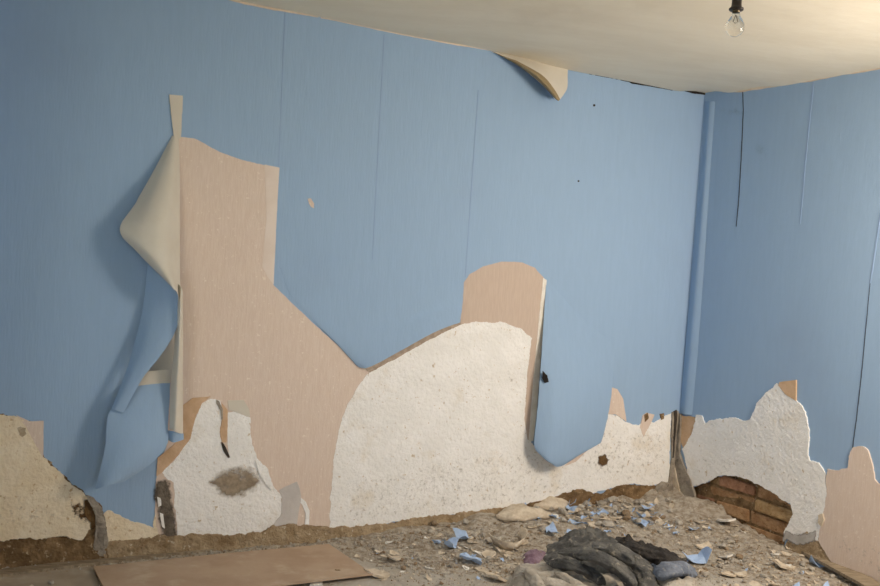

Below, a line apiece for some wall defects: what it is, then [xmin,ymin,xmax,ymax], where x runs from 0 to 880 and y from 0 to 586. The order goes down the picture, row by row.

crack [736,92,744,227]
flaking render [0,260,830,569]
crack [852,217,880,448]